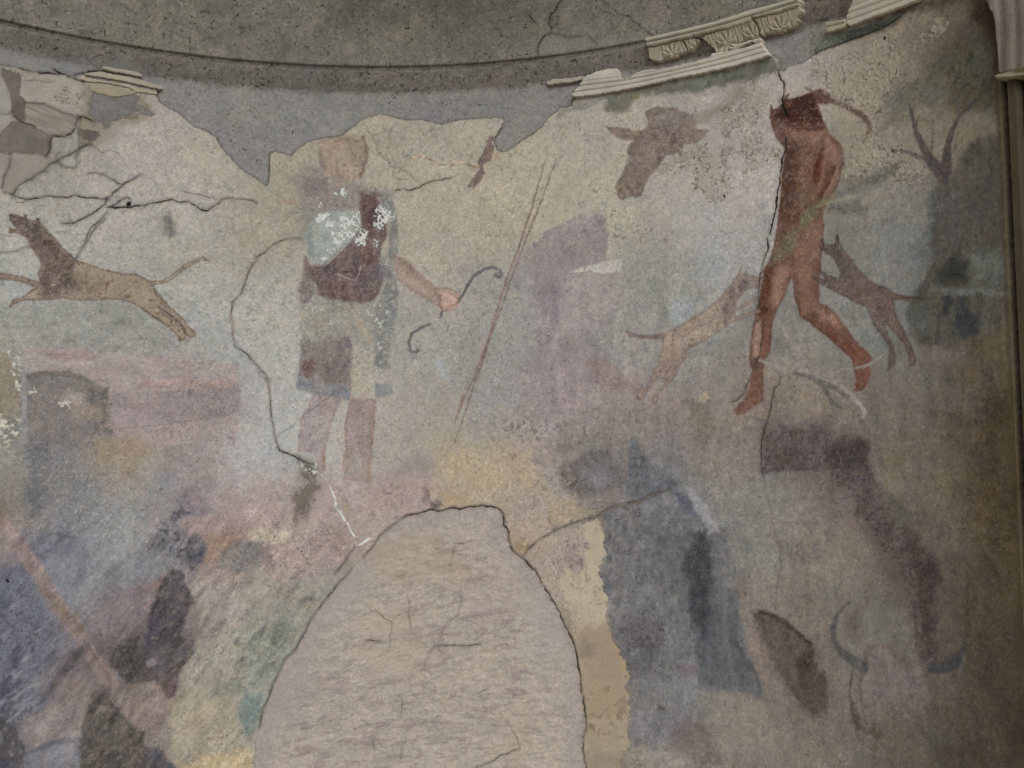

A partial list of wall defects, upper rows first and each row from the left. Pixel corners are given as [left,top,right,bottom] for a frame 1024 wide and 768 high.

crack [528,1,597,56]
crack [0,69,255,273]
peeling [315,202,396,275]
crack [731,71,789,403]
crack [229,239,676,767]